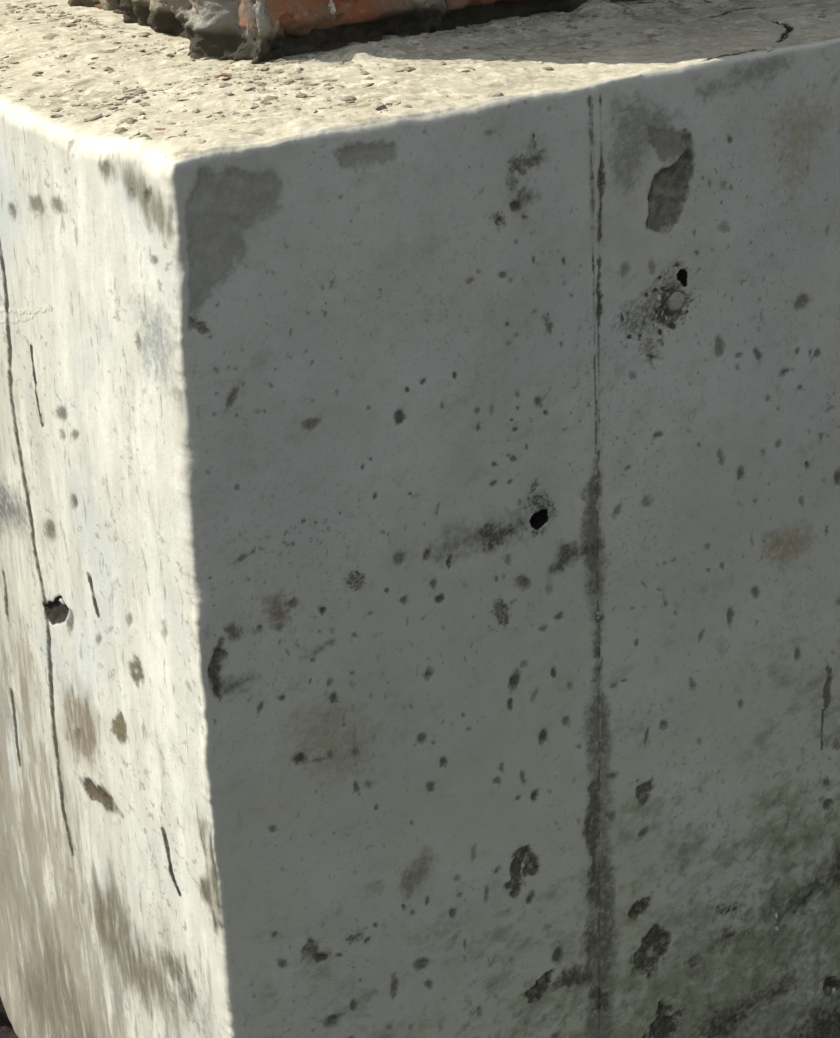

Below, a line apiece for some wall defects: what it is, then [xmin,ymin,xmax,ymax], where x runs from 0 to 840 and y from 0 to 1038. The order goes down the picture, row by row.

spalling [647,133,694,231]
water stain [592,257,603,335]
spalling [621,264,691,358]
water stain [583,450,601,593]
spalling [505,846,539,898]
water stain [562,781,611,986]
spalling [631,925,670,978]
spalling [643,1000,684,1038]